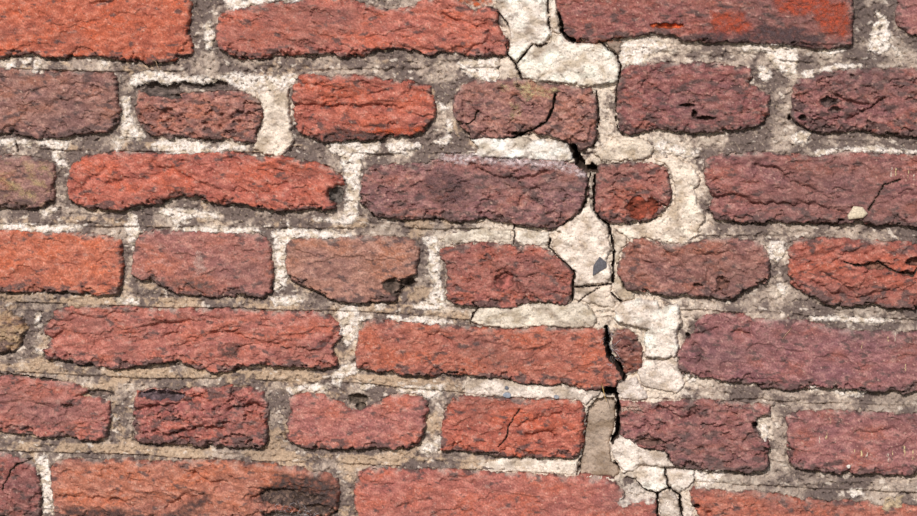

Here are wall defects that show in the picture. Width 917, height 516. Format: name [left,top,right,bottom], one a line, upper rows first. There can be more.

crack [497,0,576,80]
crack [513,93,557,138]
crack [547,40,623,304]
crack [498,409,520,447]
crack [600,325,684,516]